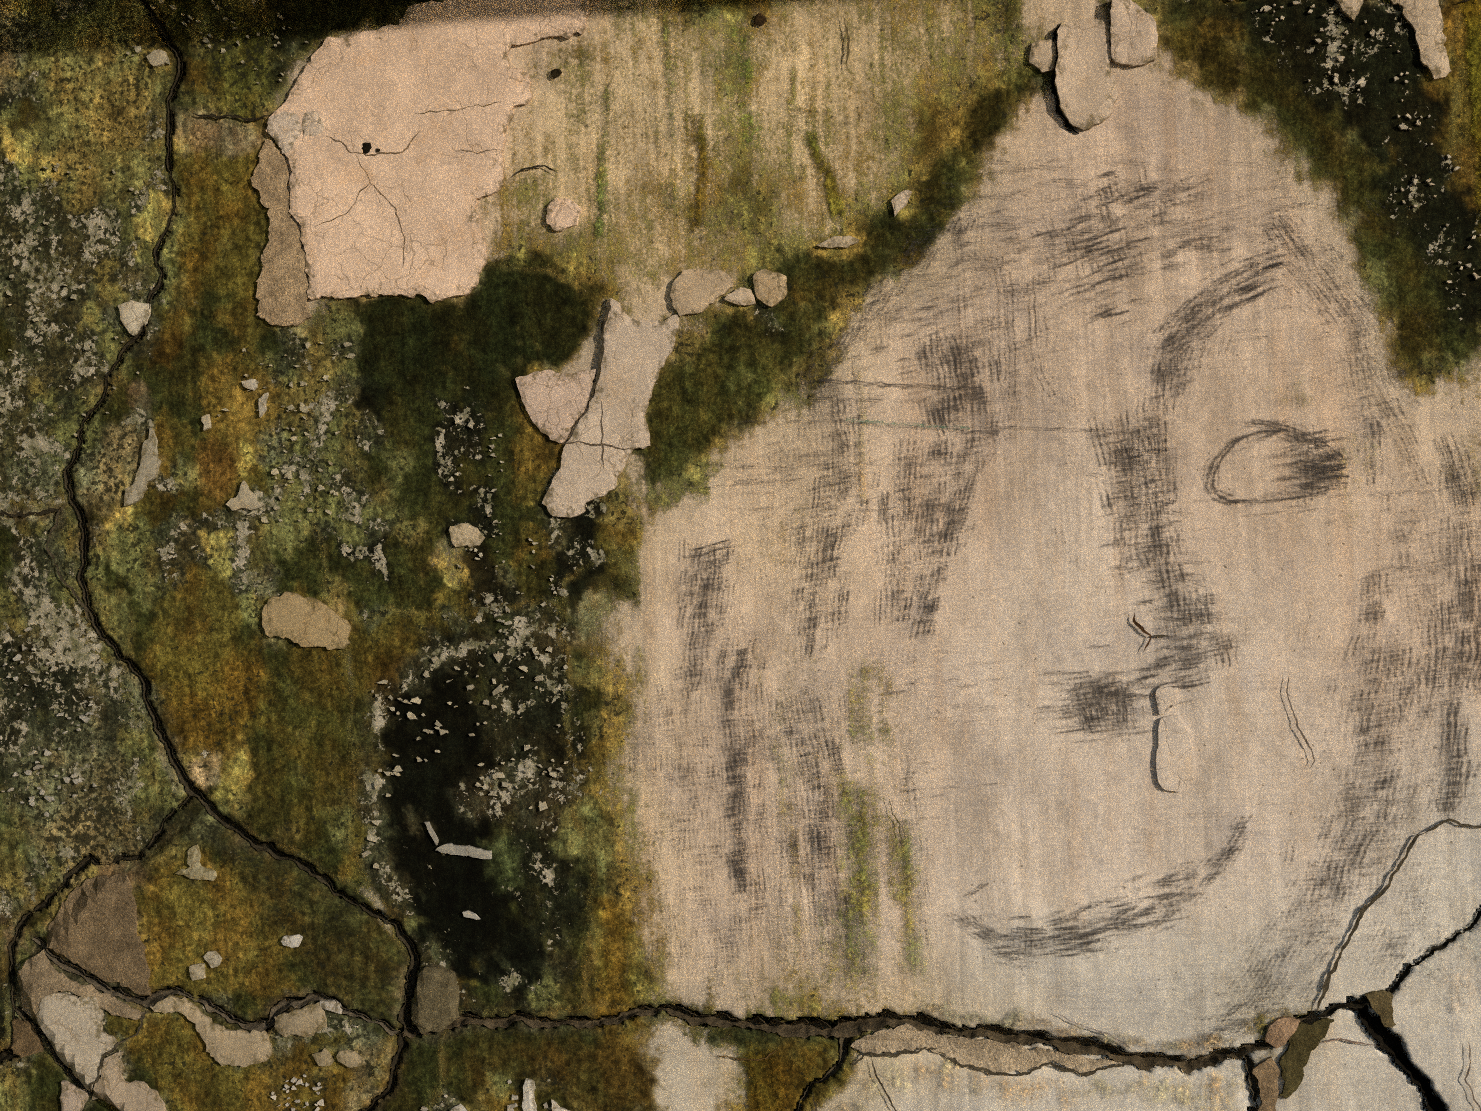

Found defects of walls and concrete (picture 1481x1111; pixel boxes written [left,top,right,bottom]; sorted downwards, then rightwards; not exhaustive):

crack [141,0,183,309]
crack [317,102,497,265]
peeling [250,0,597,327]
crack [1052,25,1079,134]
peeling [1028,0,1158,132]
peeling [1390,0,1452,130]
leakage [1450,0,1481,206]
peeling [515,268,787,518]
crack [0,299,1289,1111]
leakage [429,555,1244,1111]
spalling [11,873,366,1111]
crack [1296,818,1481,1111]